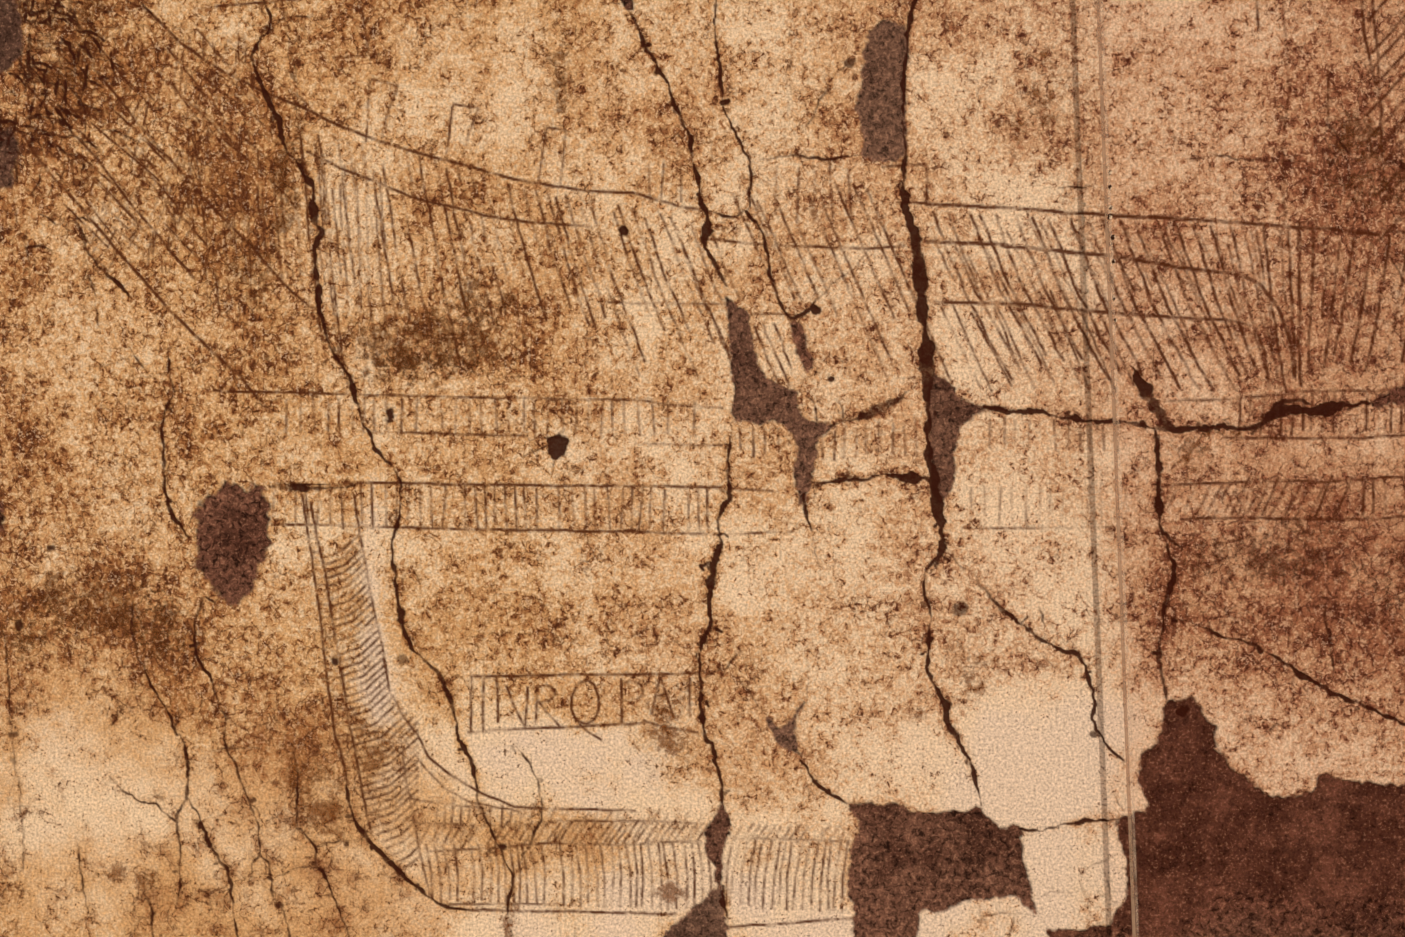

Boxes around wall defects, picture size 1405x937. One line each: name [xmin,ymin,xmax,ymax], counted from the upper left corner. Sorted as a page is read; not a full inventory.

spalling [0,124,25,196]
spalling [0,0,28,81]
spalling [614,0,637,14]
crack [606,0,873,322]
spalling [840,16,914,167]
spalling [189,474,360,610]
crack [0,0,556,937]
spalling [721,289,841,508]
crack [692,0,1405,845]
spalling [658,799,735,937]
crack [975,903,1041,937]
spalling [843,693,1405,937]